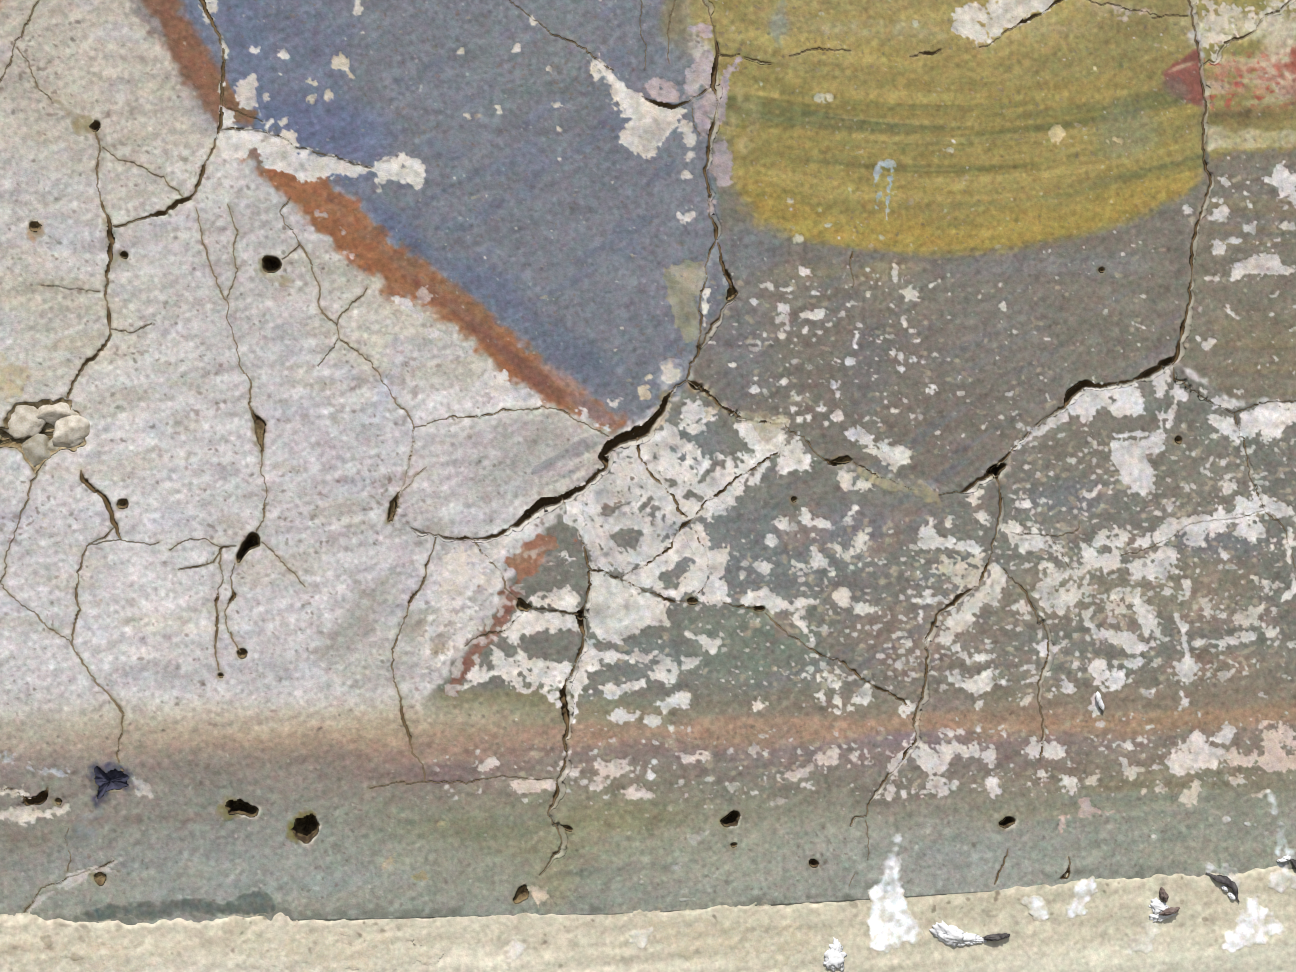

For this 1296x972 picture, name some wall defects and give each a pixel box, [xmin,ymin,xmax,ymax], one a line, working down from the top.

peeling [216,73,426,192]
peeling [589,22,743,225]
crack [0,0,371,771]
peeling [460,263,941,729]
crack [279,0,1296,886]
peeling [769,369,1296,807]
crack [4,788,48,805]
crack [23,828,114,913]
leakage [865,833,925,954]
leakage [1020,876,1098,921]
leakage [1127,921,1163,956]
leakage [1204,789,1296,953]